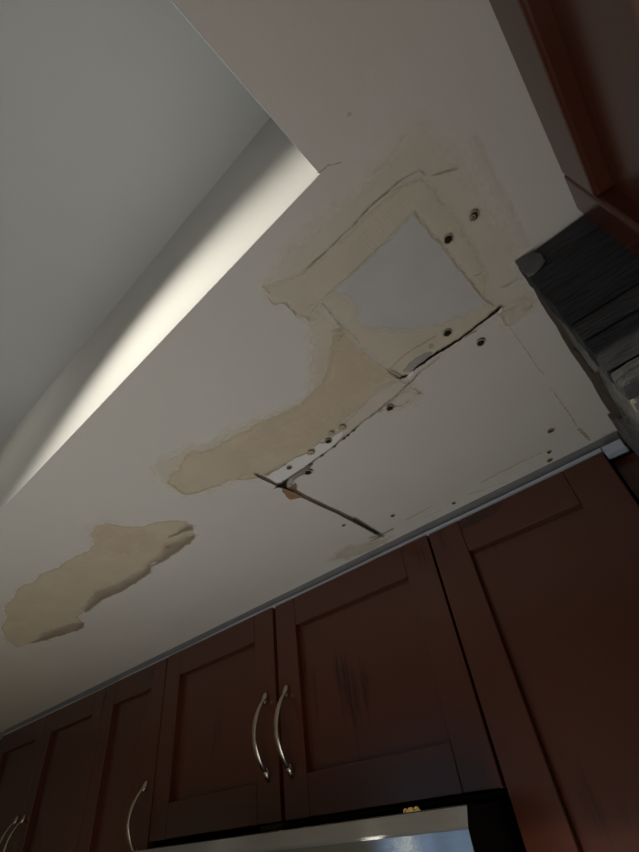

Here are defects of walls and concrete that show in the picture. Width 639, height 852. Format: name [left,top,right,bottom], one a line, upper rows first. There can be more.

spalling [264,382,405,483]
crack [254,278,522,542]
peeling [84,526,195,612]
peeling [31,623,84,643]